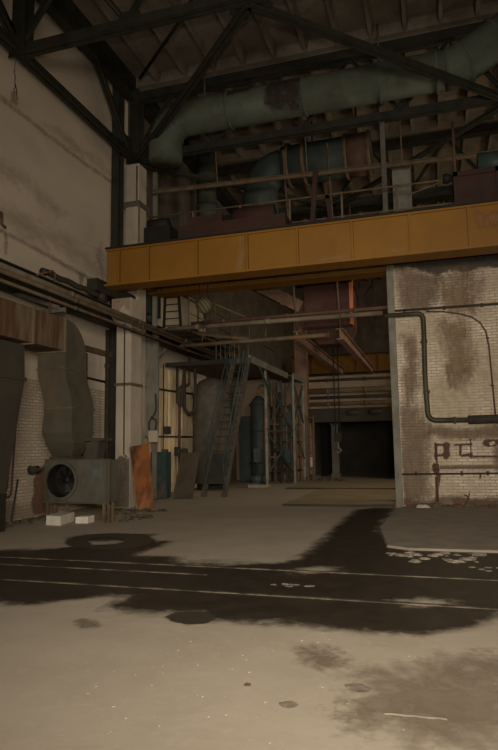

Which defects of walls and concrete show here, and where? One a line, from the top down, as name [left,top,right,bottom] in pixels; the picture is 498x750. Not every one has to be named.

rust [432,439,498,502]
water stain [0,508,498,635]